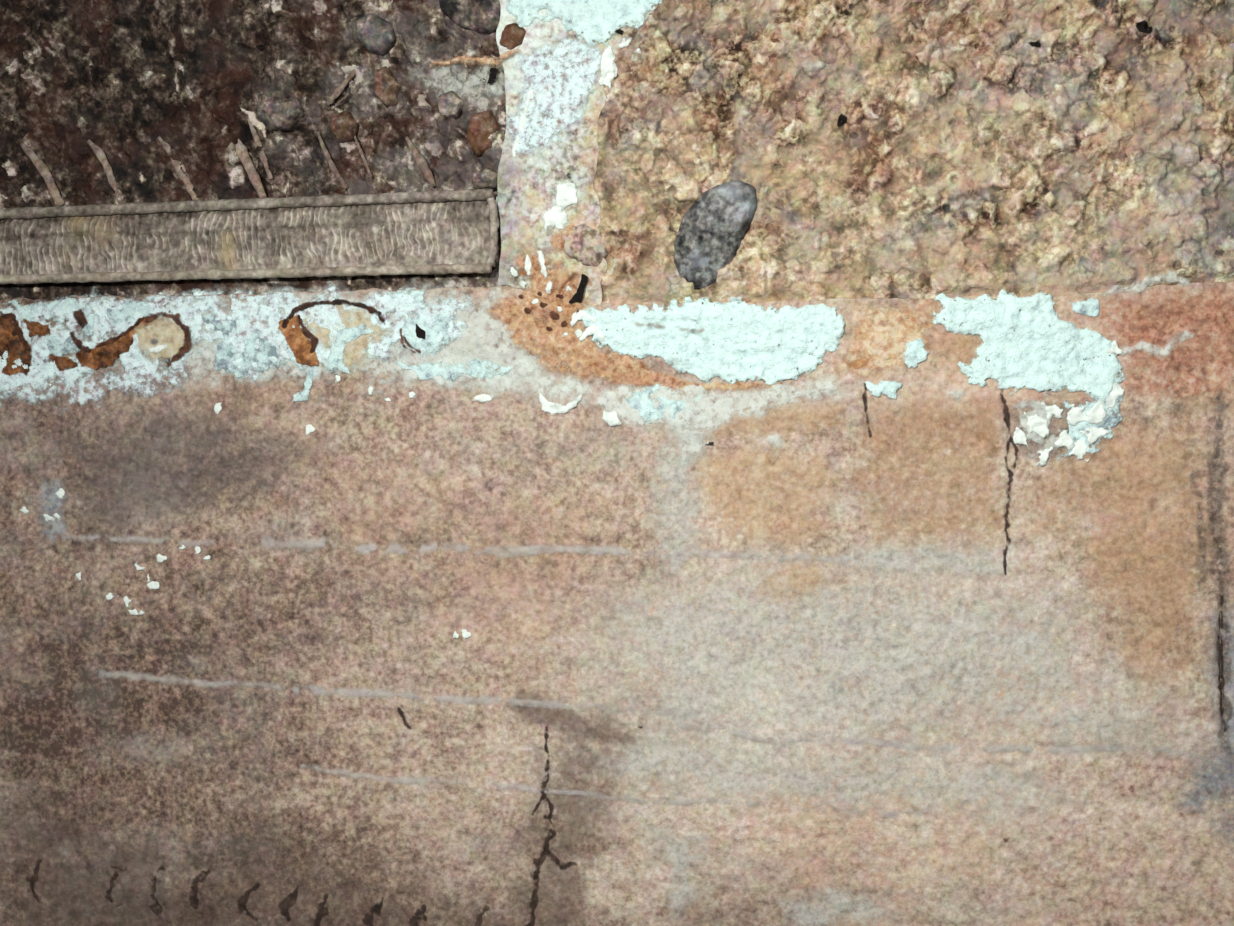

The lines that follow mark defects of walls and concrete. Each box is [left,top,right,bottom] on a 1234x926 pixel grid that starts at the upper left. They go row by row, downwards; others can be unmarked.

spalling [0,311,50,375]
spalling [49,312,191,371]
spalling [278,299,385,382]
peeling [570,310,605,341]
corrosion [488,224,782,391]
flaking render [933,289,1125,466]
crack [1000,394,1018,575]
leakage [1181,397,1234,807]
crack [1218,596,1226,732]
crack [525,727,576,926]